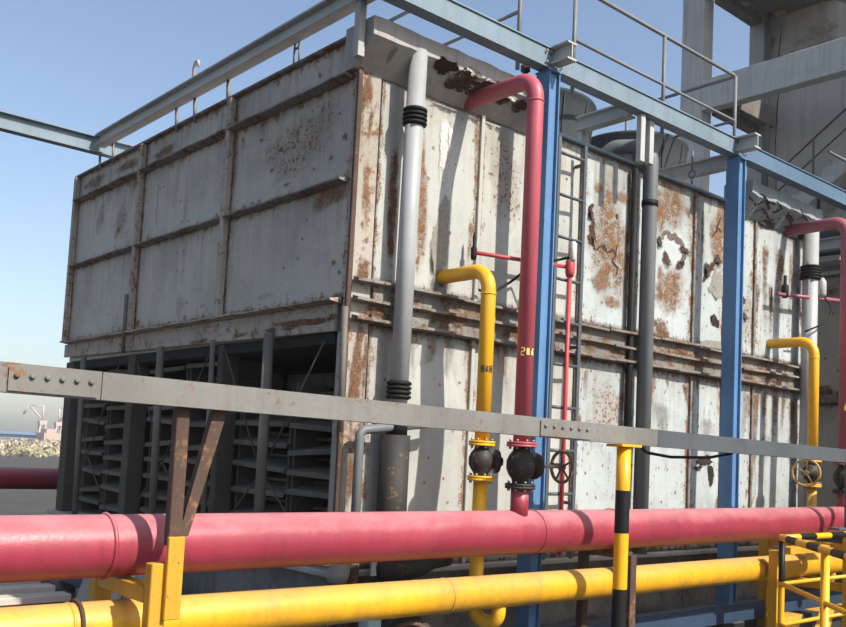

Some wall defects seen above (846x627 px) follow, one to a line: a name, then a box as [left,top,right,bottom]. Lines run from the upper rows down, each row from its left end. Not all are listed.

corrosion [360,73,373,133]
peeling [444,66,500,96]
peeling [493,94,527,113]
corrosion [362,163,372,225]
peeling [429,197,450,290]
crack [596,244,619,275]
corrosion [590,182,639,307]
peeling [657,230,692,270]
peeling [703,254,723,299]
corrosion [702,205,725,272]
peeling [749,194,808,240]
corrosion [348,318,369,398]